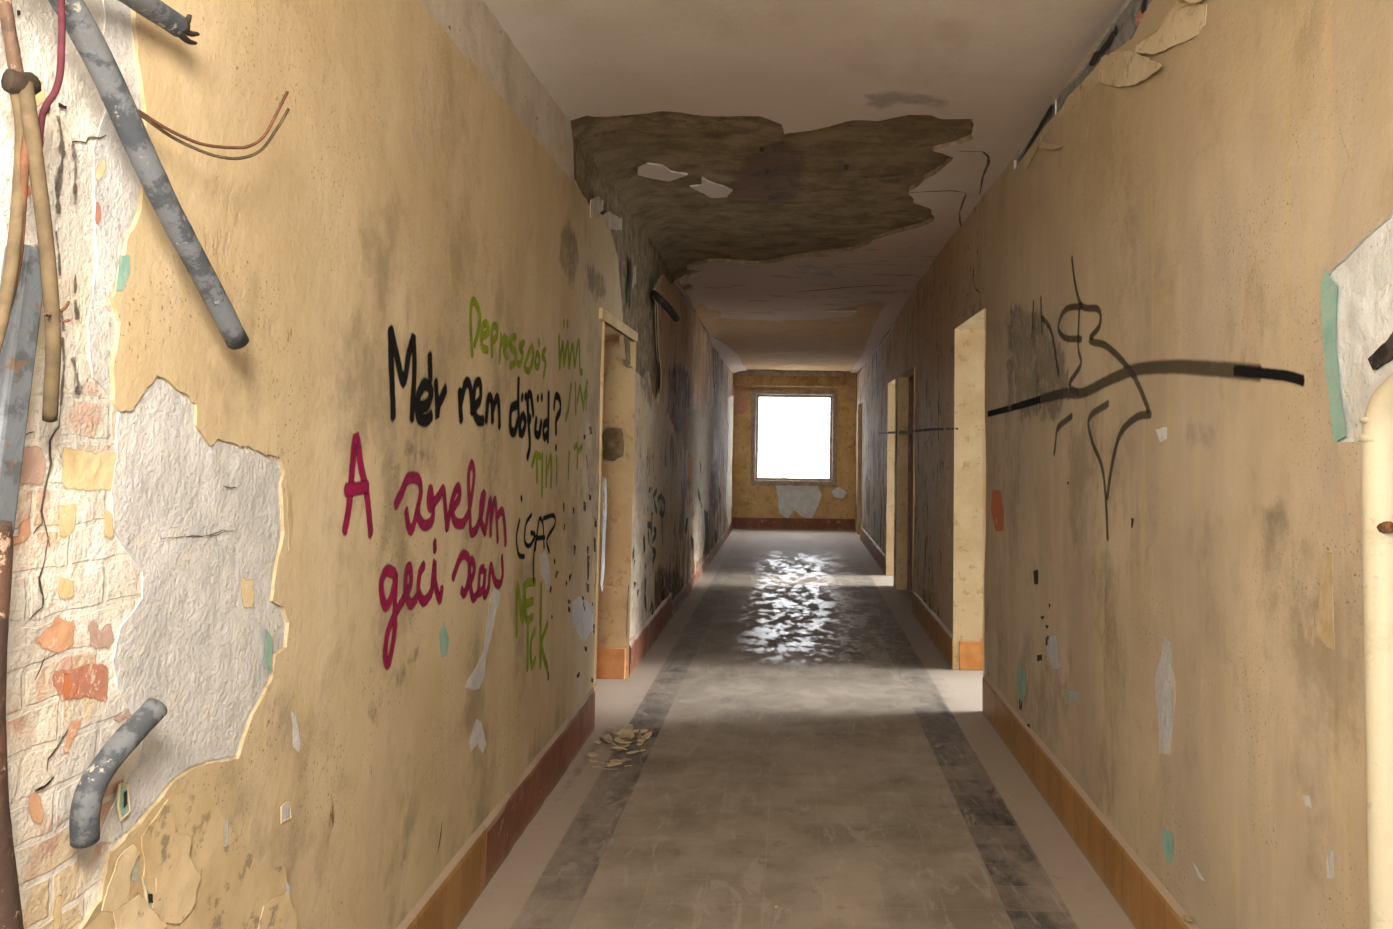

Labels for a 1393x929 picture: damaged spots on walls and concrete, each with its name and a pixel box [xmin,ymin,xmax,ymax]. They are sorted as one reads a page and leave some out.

peeling [1014,0,1207,171]
flaking render [1321,211,1393,443]
flaking render [0,0,297,929]
peeling [292,712,301,752]